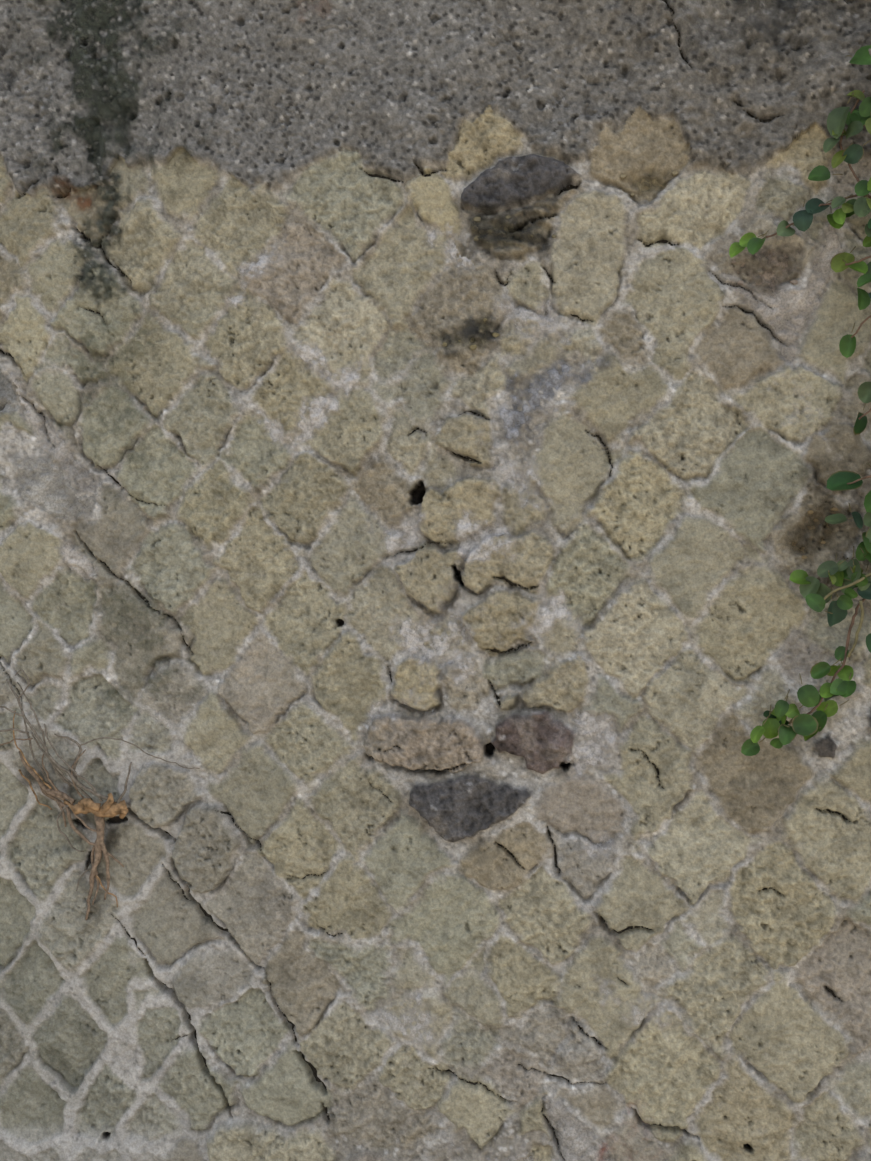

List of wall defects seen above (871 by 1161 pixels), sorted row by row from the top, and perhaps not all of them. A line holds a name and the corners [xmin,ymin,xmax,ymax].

crack [662,0,692,68]
crack [76,531,193,653]
crack [162,864,231,934]
crack [173,1012,208,1068]
crack [263,967,330,1120]